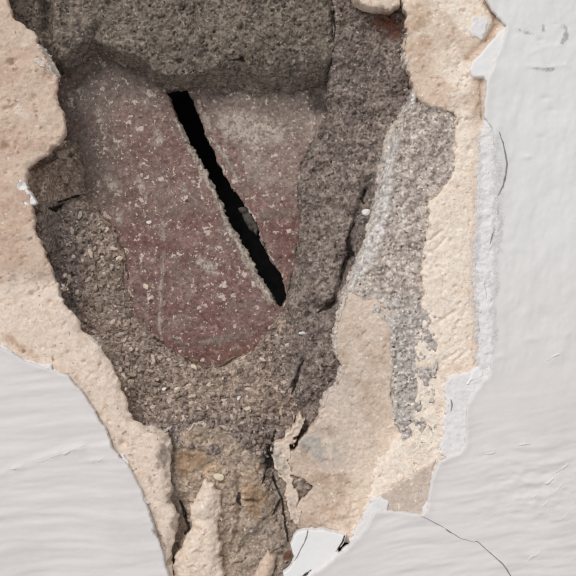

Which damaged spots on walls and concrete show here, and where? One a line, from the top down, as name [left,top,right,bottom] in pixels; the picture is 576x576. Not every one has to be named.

spalling [0,0,389,576]
crack [168,91,286,306]
spalling [265,0,506,547]
crack [496,132,508,198]
crack [262,428,308,561]
crack [421,516,511,576]